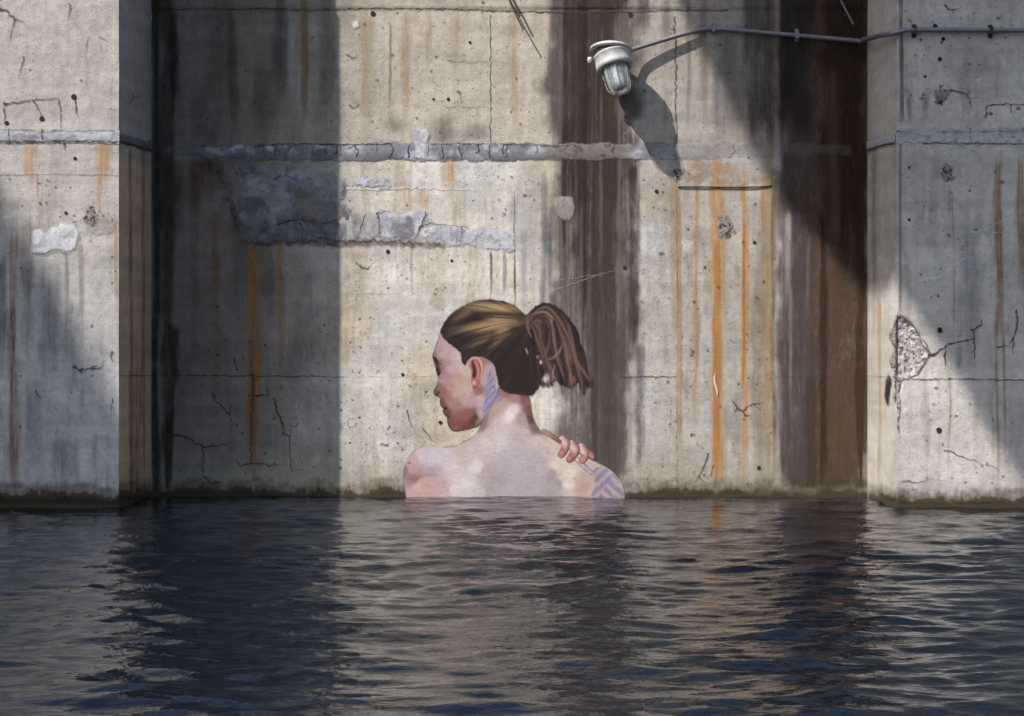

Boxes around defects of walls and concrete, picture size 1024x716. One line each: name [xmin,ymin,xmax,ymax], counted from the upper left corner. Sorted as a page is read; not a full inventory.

water stain [544,0,648,145]
crack [922,89,1024,145]
water stain [745,0,868,488]
crack [169,357,299,484]
water stain [541,157,641,478]
corrosion [711,164,724,471]
crack [732,400,764,417]
spalling [884,315,930,430]
crack [927,310,1018,366]